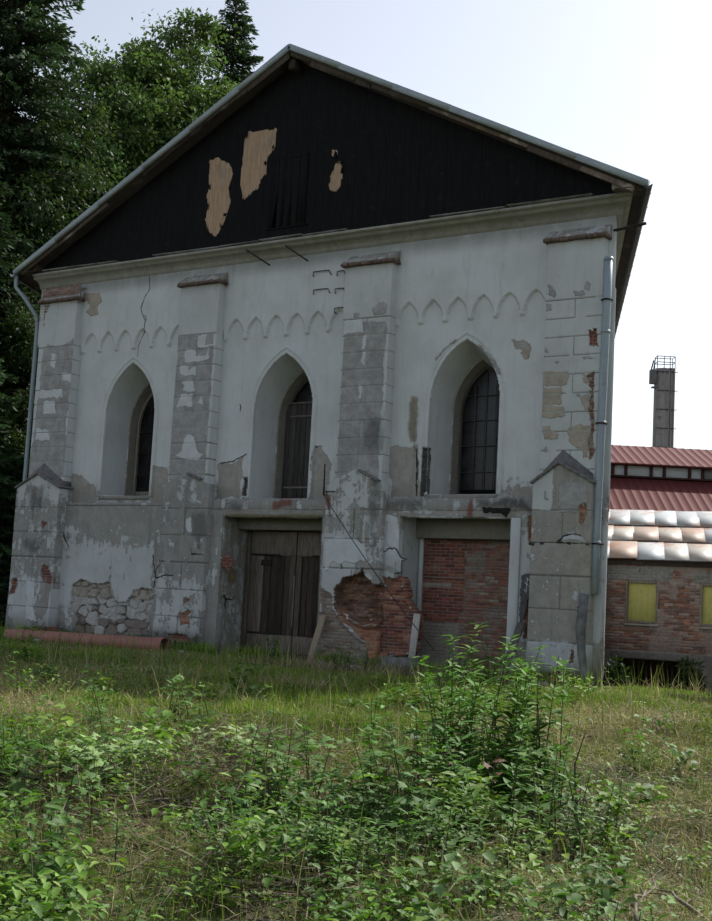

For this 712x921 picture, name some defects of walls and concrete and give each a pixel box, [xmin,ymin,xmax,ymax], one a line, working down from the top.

peeling [204,128,277,236]
peeling [328,149,343,192]
crack [137,275,150,357]
spalling [582,327,599,359]
peeling [29,338,74,478]
peeling [169,333,216,480]
peeling [542,361,595,460]
spalling [41,565,55,584]
spalling [70,580,154,635]
flaking render [331,568,424,661]